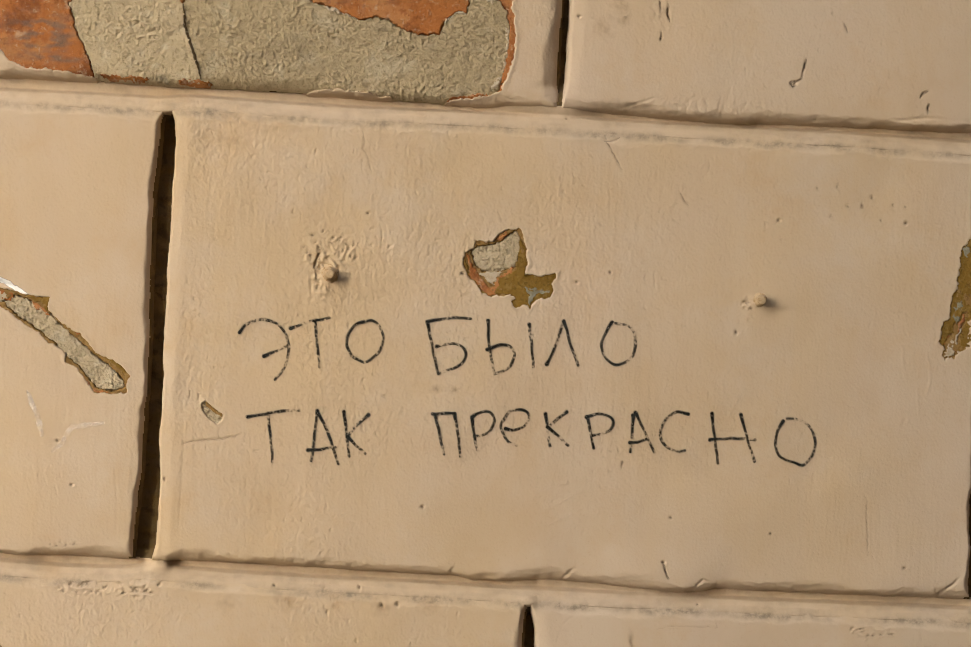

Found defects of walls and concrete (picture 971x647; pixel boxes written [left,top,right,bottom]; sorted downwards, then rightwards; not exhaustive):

peeling [0,0,516,105]
peeling [0,288,130,394]
peeling [463,228,556,309]
peeling [939,239,971,359]